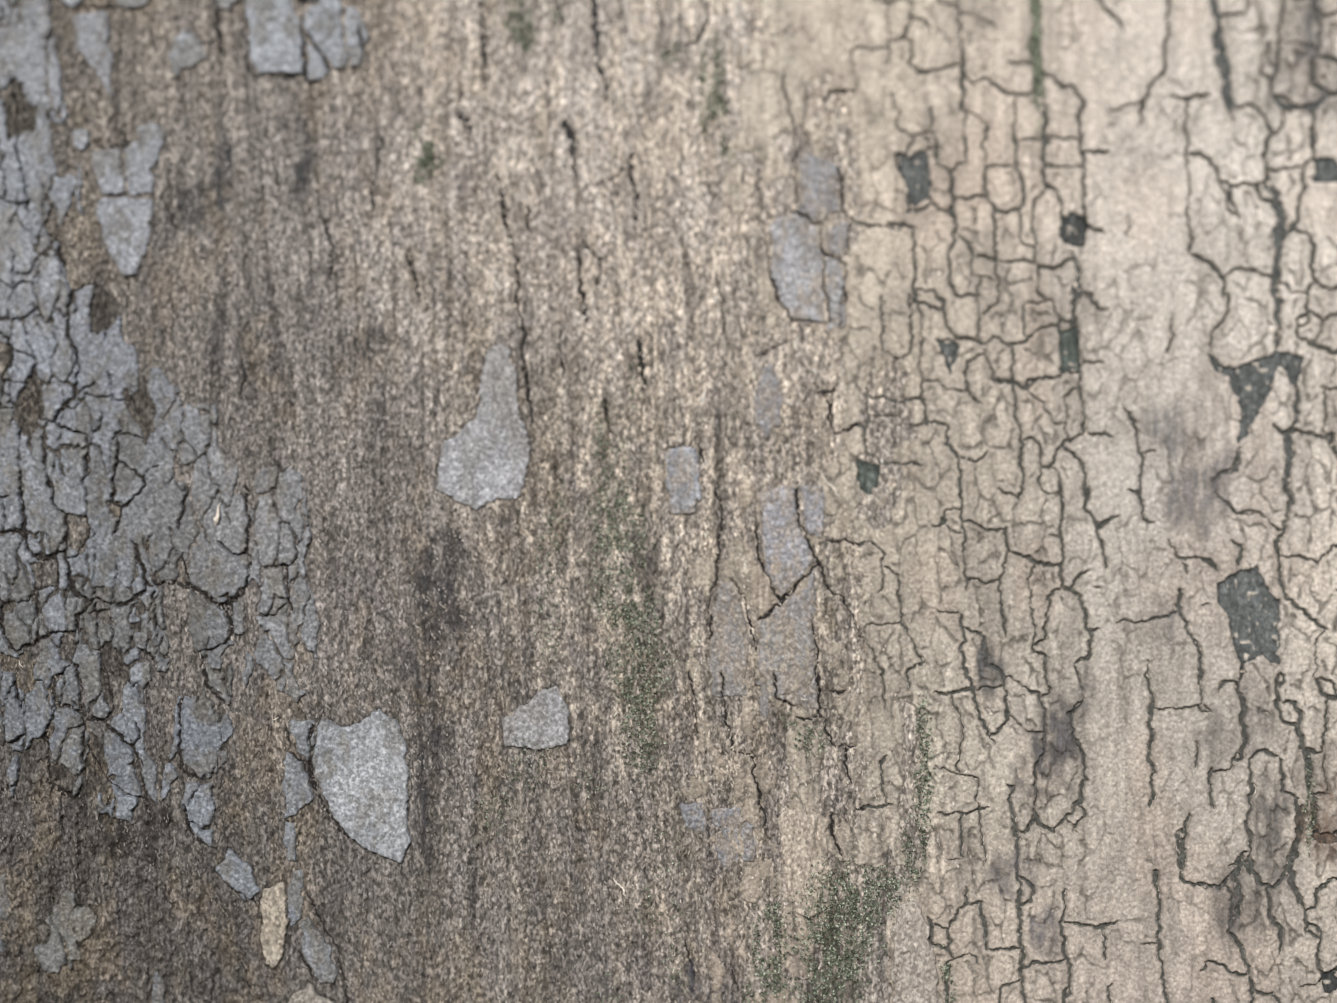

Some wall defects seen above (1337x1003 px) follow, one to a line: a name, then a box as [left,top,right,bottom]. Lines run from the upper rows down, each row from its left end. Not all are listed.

peeling [769,153,851,331]
peeling [0,0,412,1003]
peeling [436,343,531,510]
peeling [753,363,782,439]
crack [669,0,1337,1003]
peeling [1208,350,1304,444]
peeling [708,485,825,724]
peeling [1217,566,1281,669]
peeling [502,686,570,750]